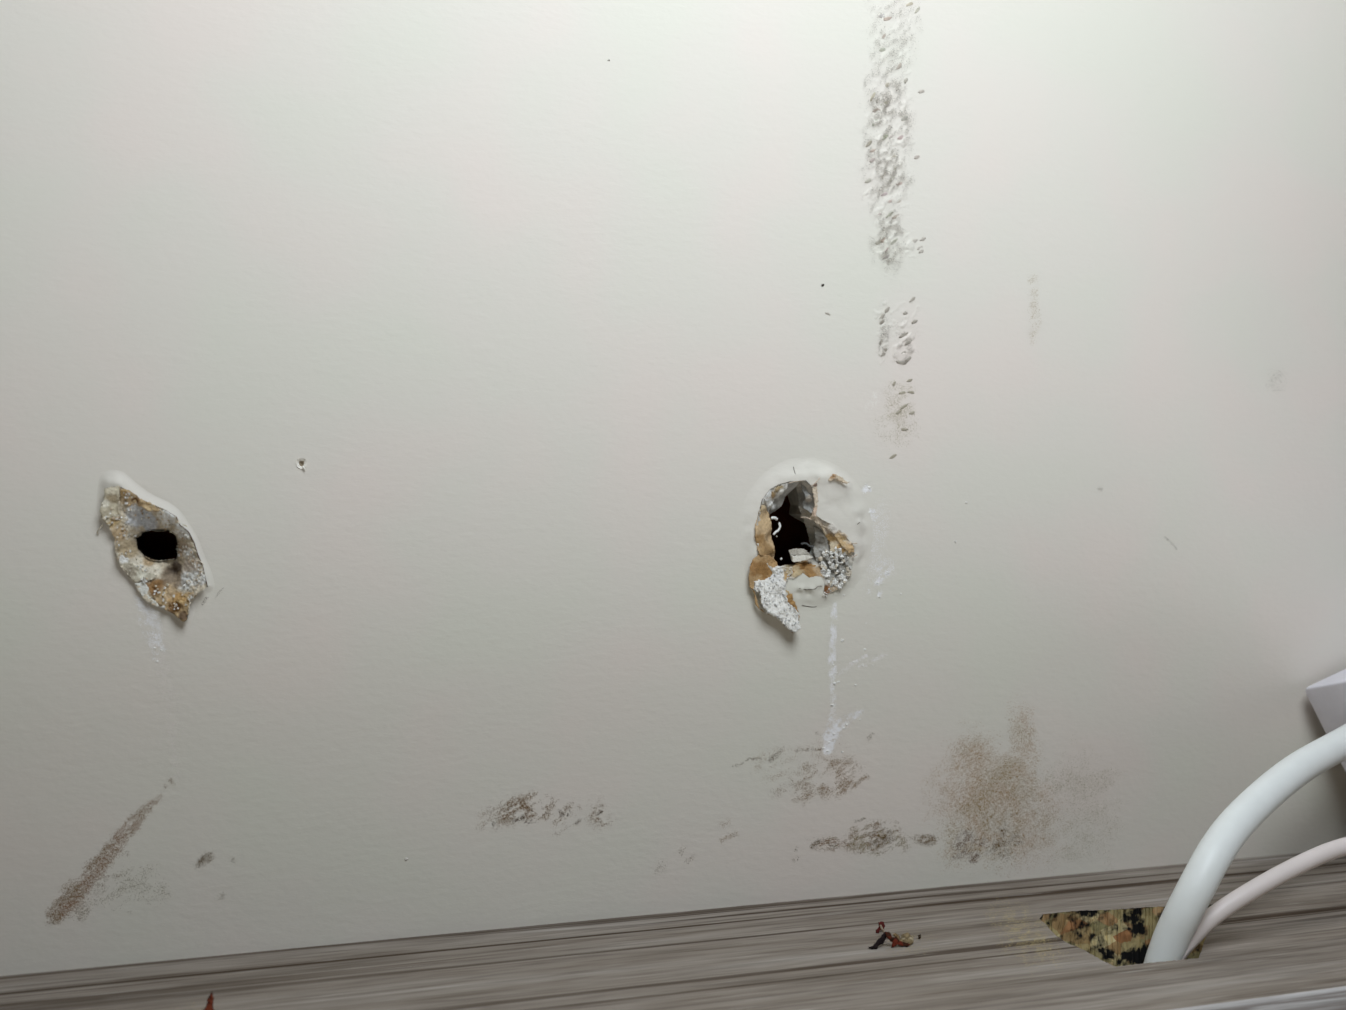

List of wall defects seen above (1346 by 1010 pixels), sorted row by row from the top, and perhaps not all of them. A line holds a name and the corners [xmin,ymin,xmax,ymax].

peeling [860,0,926,280]
peeling [872,297,923,366]
flaking render [788,548,813,562]